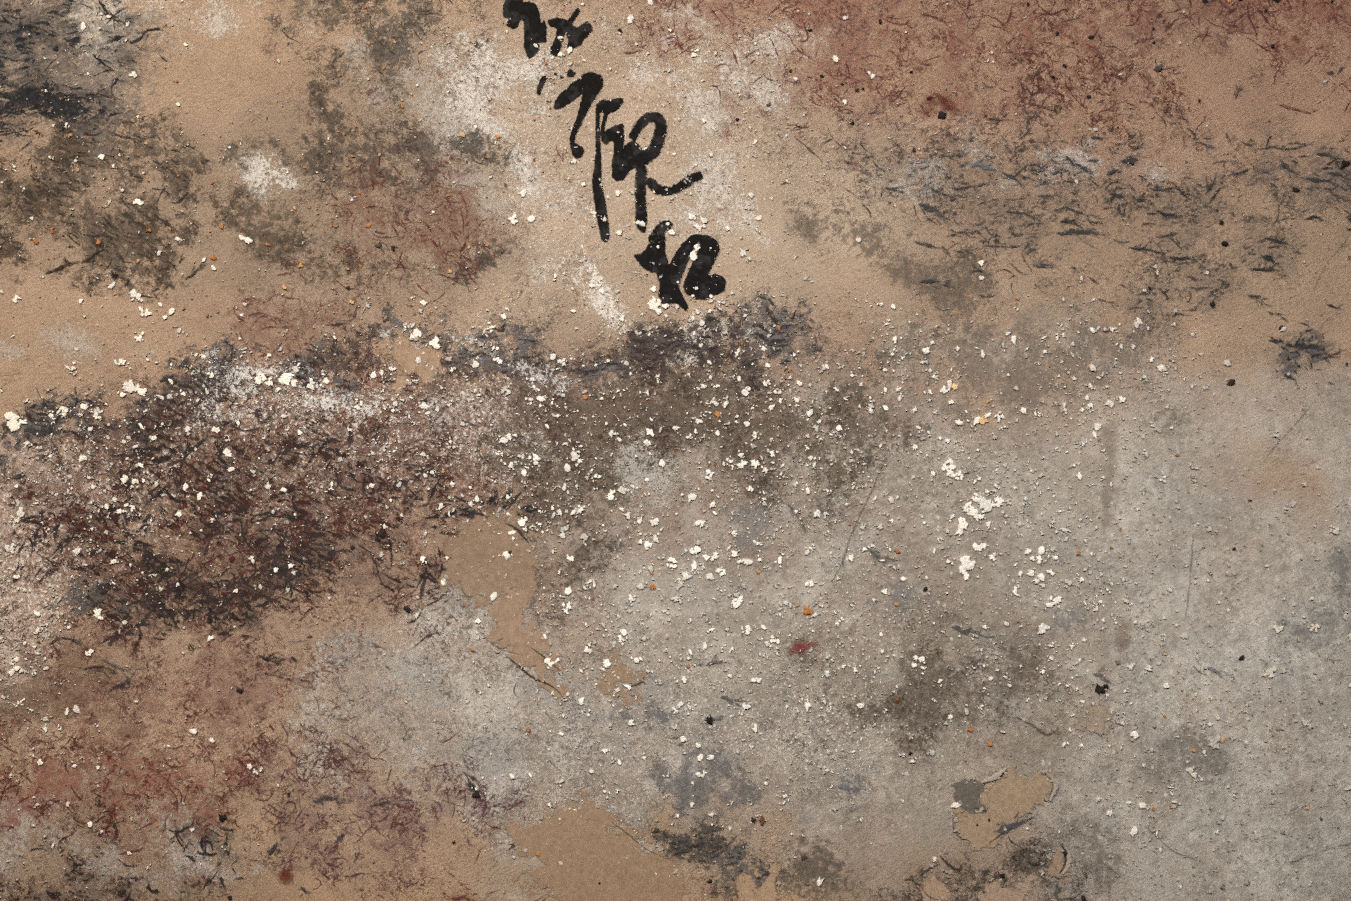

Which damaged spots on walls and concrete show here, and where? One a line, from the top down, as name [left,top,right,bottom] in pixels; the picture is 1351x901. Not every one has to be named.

leakage [0,0,930,901]
leakage [839,639,1053,751]
peeling [903,856,962,901]
leakage [888,837,1089,901]